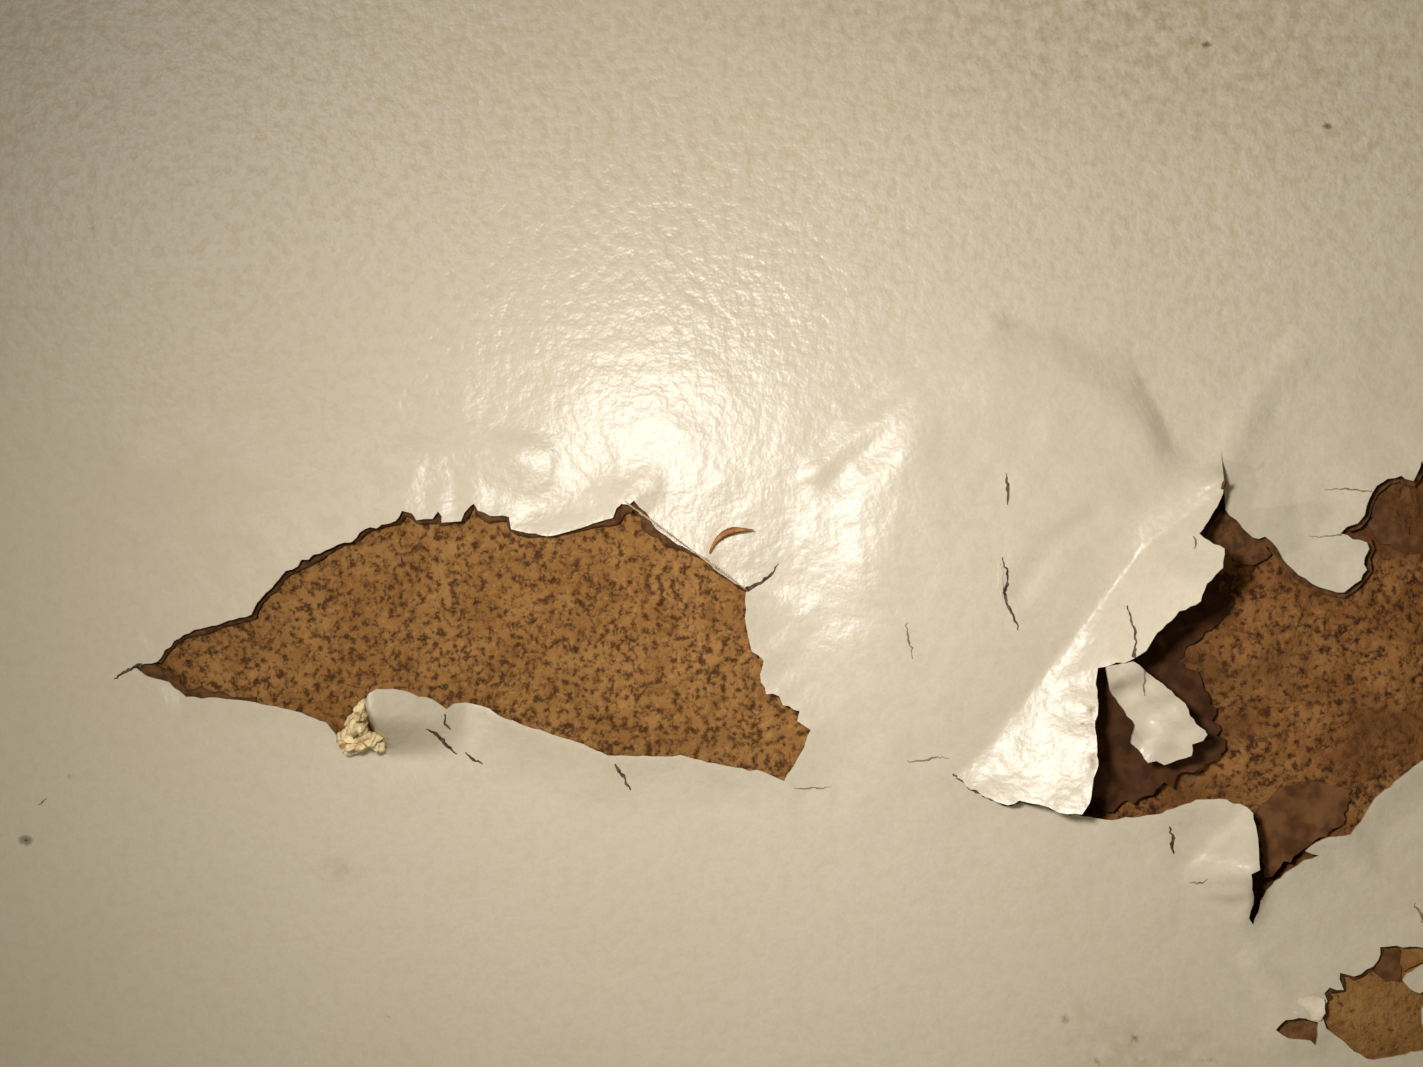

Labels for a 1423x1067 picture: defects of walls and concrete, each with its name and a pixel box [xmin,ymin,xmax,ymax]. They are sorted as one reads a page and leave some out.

peeling [48,501,810,859]
peeling [890,462,1423,1067]